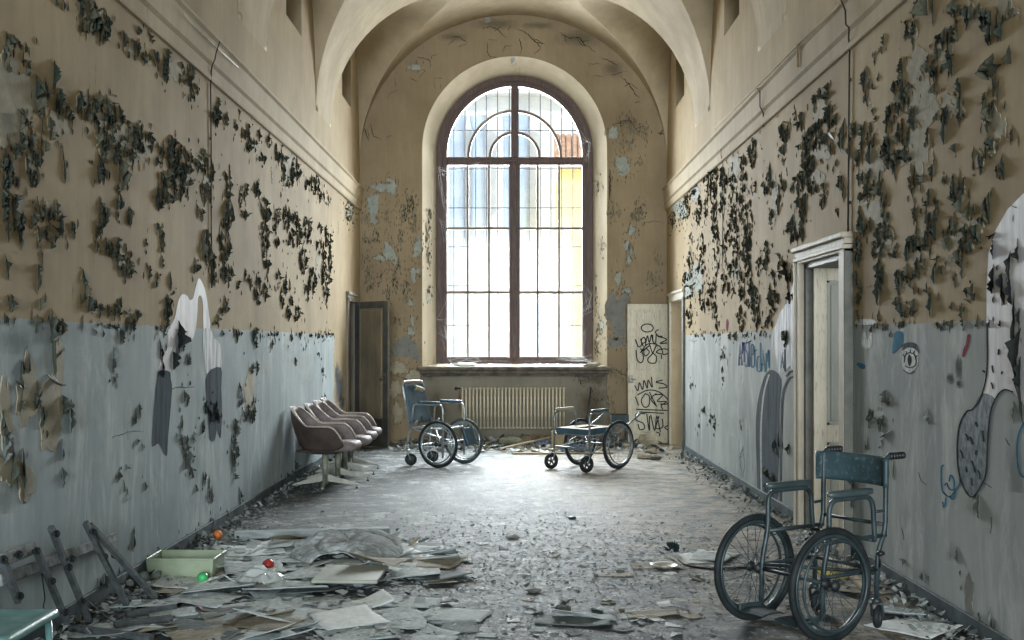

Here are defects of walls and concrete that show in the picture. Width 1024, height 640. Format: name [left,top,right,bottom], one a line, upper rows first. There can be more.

peeling [0,0,459,640]
crack [389,26,664,144]
peeling [593,110,652,194]
peeling [594,200,663,357]
peeling [667,0,1023,424]